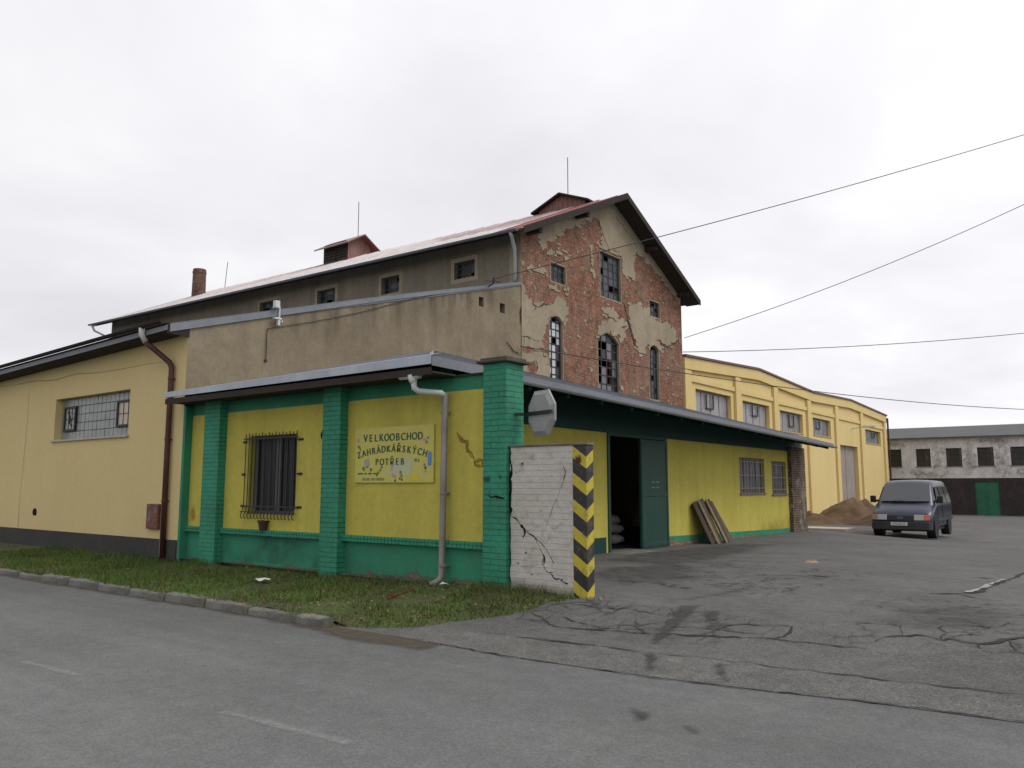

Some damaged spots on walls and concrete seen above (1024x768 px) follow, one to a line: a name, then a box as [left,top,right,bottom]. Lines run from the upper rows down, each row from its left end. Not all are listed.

flaking render [521,218,684,408]
crack [456,432,483,467]
crack [487,465,833,639]